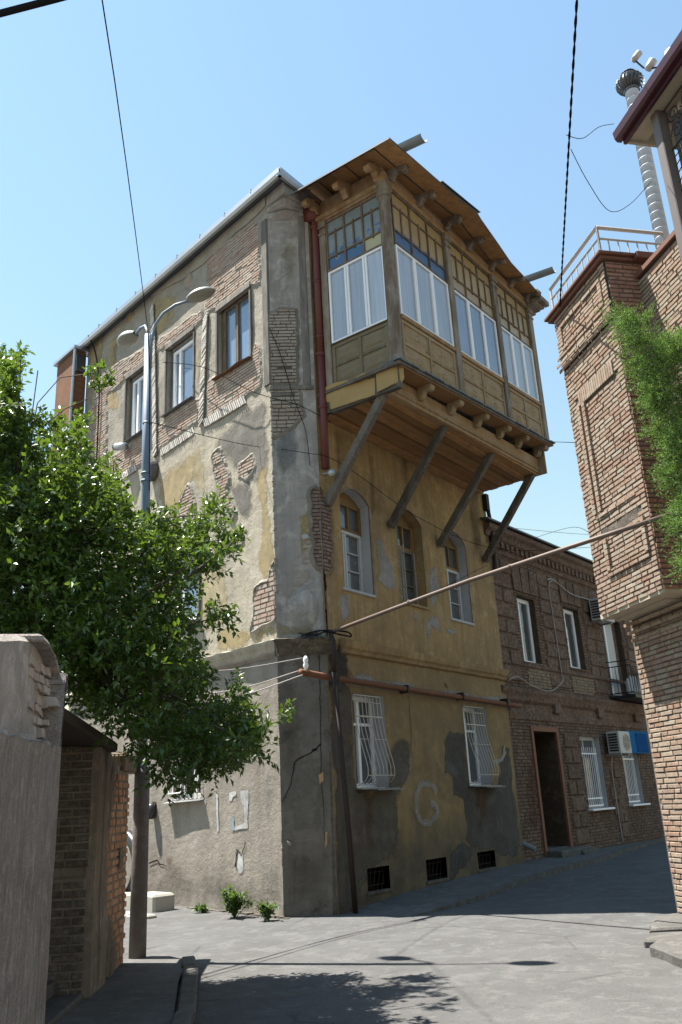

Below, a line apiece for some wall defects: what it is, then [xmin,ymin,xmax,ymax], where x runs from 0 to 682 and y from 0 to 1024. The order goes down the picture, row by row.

spalling [89,197,312,649]
spalling [301,484,335,577]